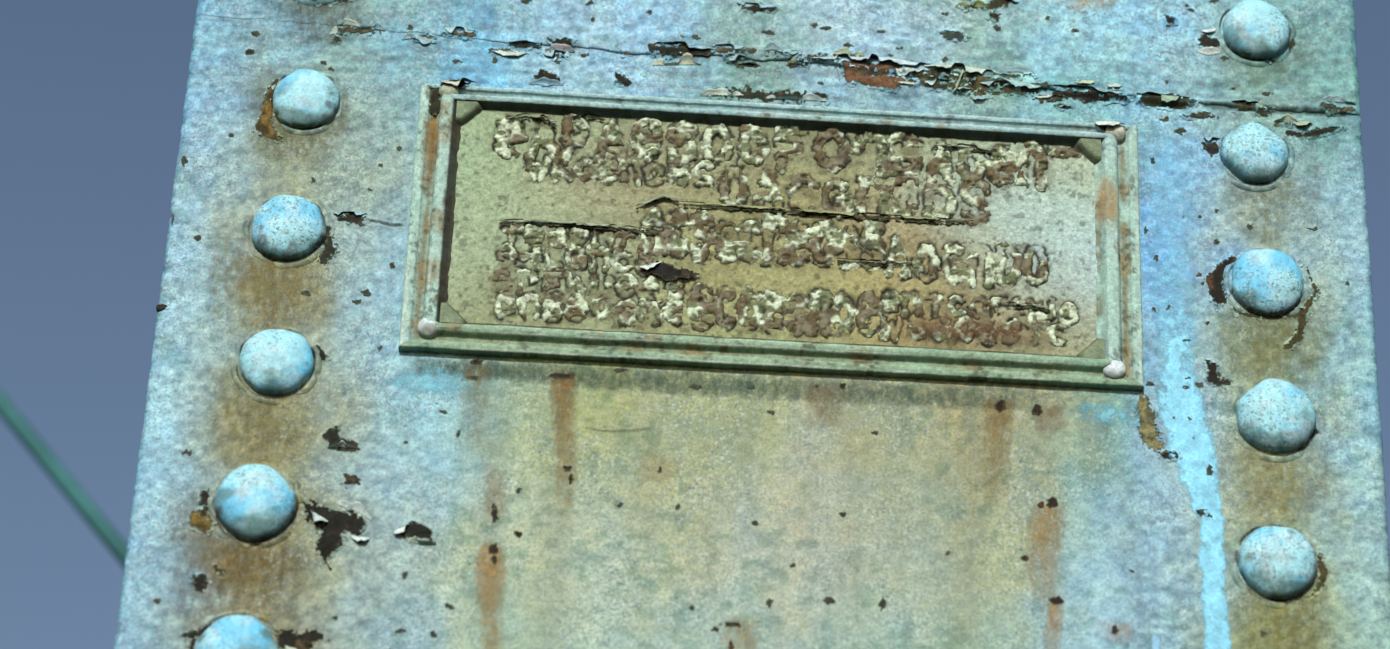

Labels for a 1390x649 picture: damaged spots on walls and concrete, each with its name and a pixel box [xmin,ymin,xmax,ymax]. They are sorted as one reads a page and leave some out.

peeling [610,0,1360,139]
peeling [317,210,366,269]
peeling [1196,239,1321,350]
peeling [322,423,361,453]
rust [548,372,575,484]
rust [991,399,1007,439]
peeling [298,473,372,568]
peeling [394,519,436,545]
rust [1036,497,1059,545]
rust [482,542,498,610]
peeling [271,626,332,649]
rust [1048,596,1064,629]